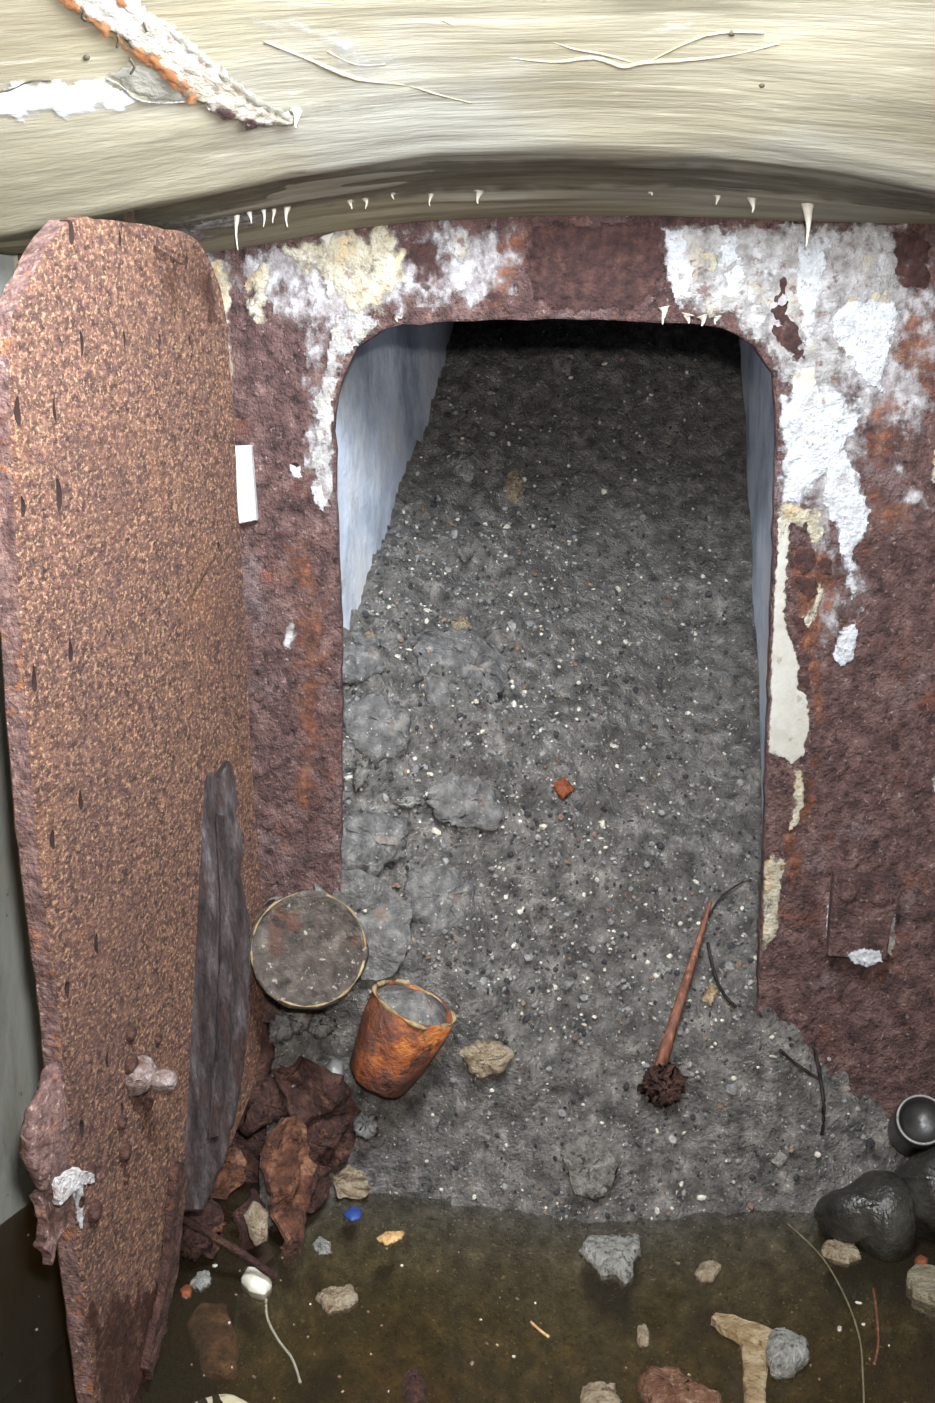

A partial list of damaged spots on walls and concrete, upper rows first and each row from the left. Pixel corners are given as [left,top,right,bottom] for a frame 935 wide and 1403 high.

spalling [0,0,295,130]
rust [409,240,444,291]
rust [498,222,666,313]
rust [892,230,931,289]
rust [770,277,805,362]
rust [895,316,935,369]
rust [868,401,905,466]
water stain [127,161,935,831]
rust [792,549,835,710]
water stain [762,855,785,949]
rust [29,1190,73,1265]